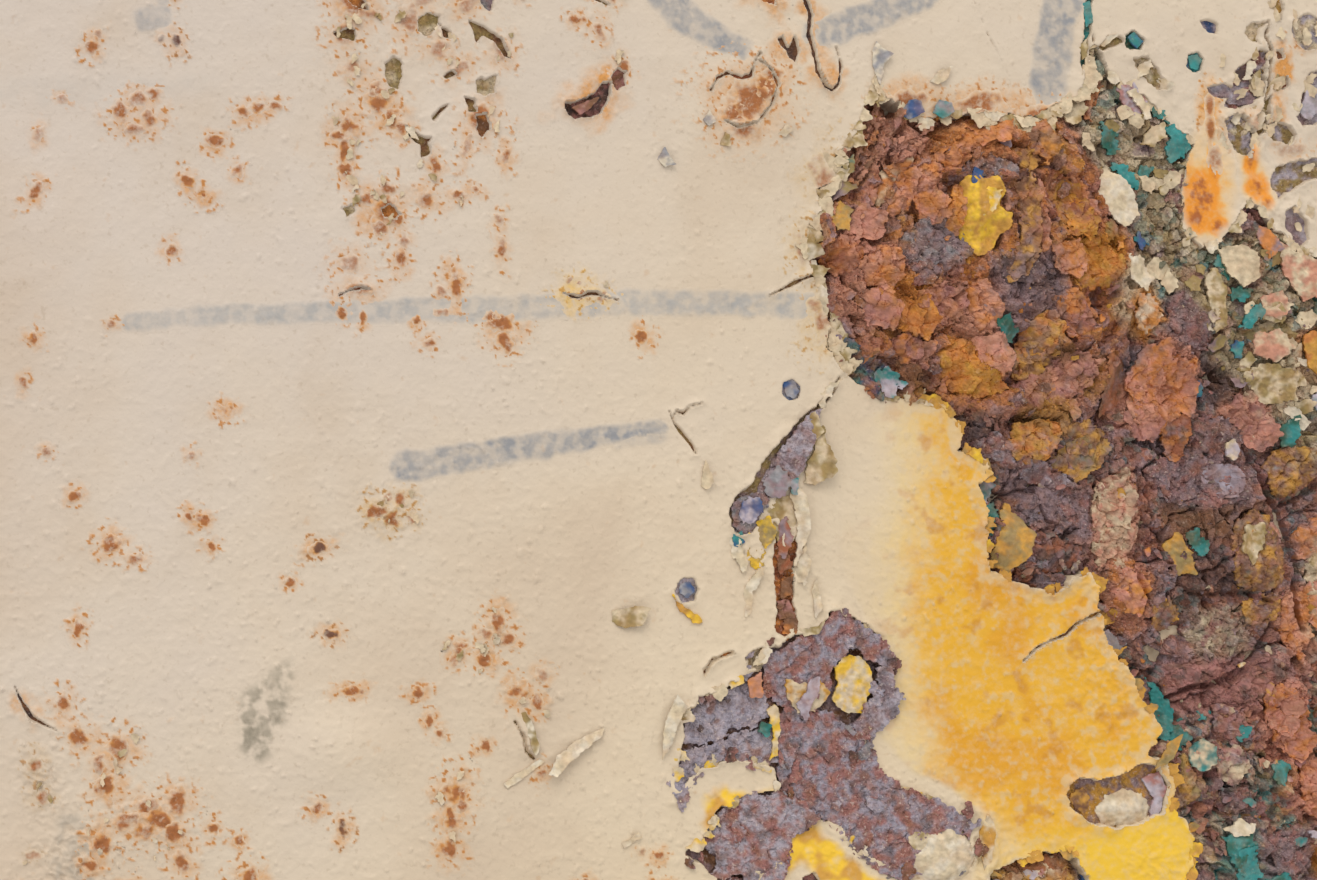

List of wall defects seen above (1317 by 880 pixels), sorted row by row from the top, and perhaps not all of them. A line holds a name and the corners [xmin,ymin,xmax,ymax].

peeling [535,53,638,142]
rust [557,0,644,92]
peeling [730,0,810,68]
peeling [1207,0,1317,155]
rust [305,0,542,369]
peeling [1270,158,1317,257]
rust [536,260,624,323]
rust [664,39,1317,880]
peeling [662,379,996,880]
crack [1023,610,1107,660]
rust [14,676,278,880]
peeling [1067,734,1183,827]